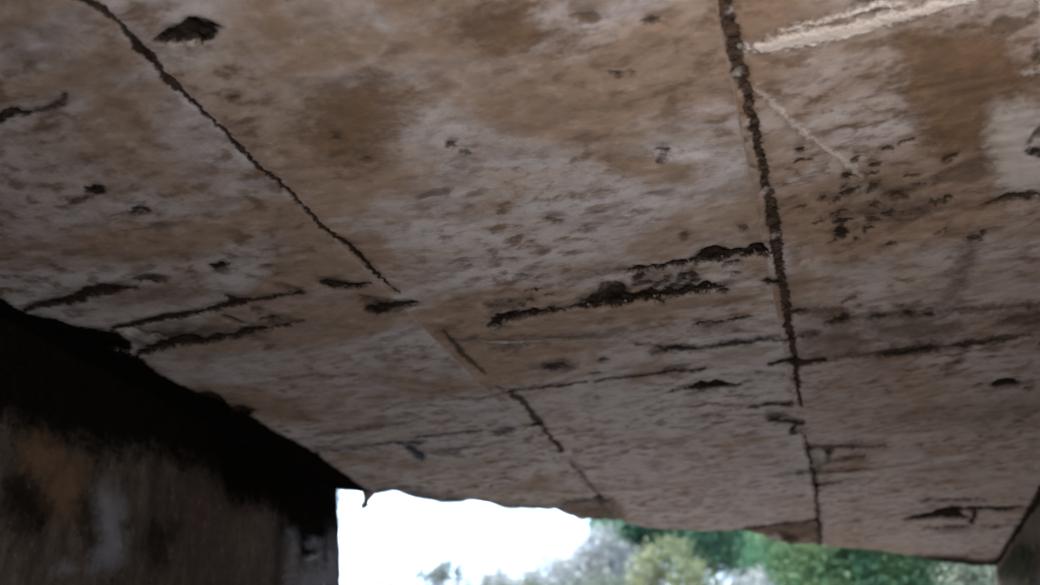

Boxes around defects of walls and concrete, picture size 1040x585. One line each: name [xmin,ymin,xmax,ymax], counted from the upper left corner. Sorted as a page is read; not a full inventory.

spalling [153,16,219,44]
crack [22,274,166,312]
crack [110,290,304,355]
crack [750,401,794,409]